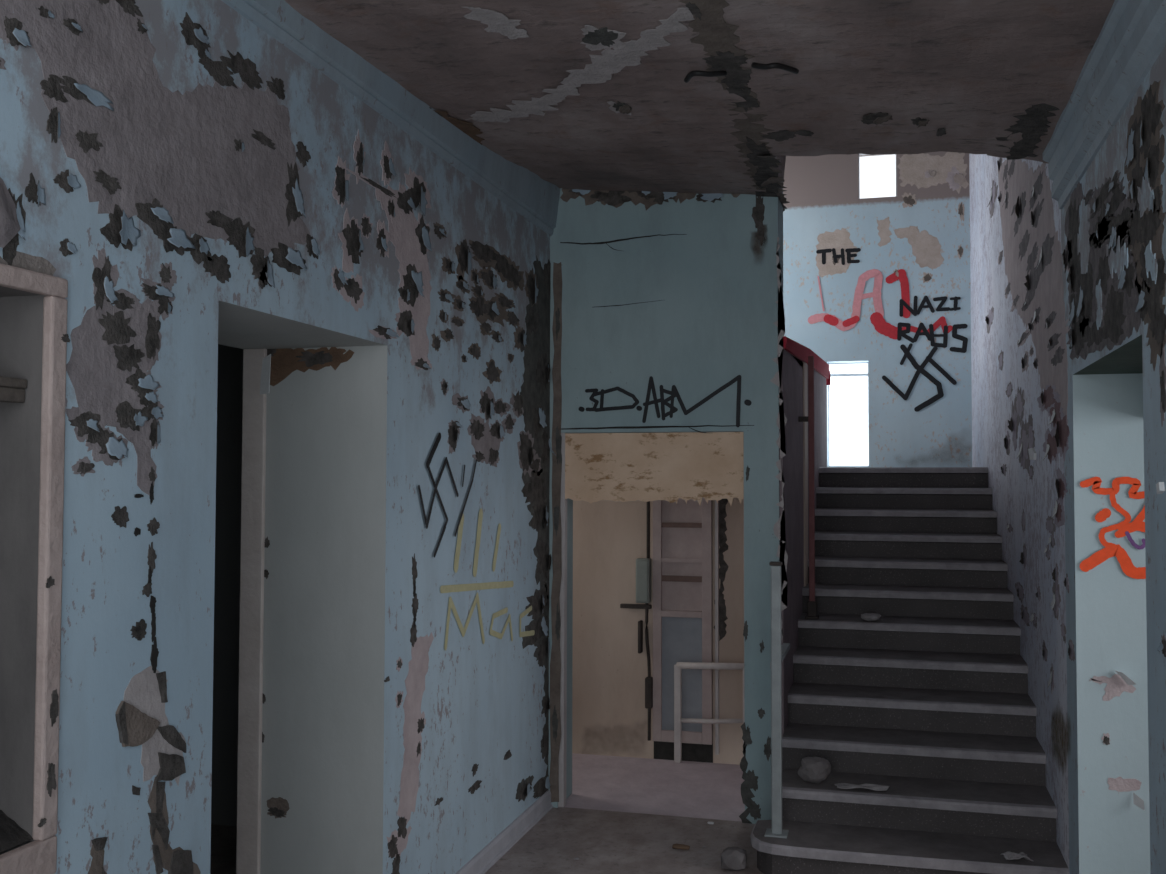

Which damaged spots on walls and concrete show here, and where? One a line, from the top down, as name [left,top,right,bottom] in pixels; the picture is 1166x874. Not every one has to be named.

spalling [429,0,789,212]
peeling [897,152,969,221]
peeling [0,0,320,495]
crack [560,234,687,251]
peeling [816,228,858,277]
peeling [877,217,944,283]
spalling [260,347,354,395]
peeling [987,80,1166,661]
peeling [331,129,562,825]
peeling [115,666,201,874]
spalling [739,722,771,824]
peeling [88,837,108,874]